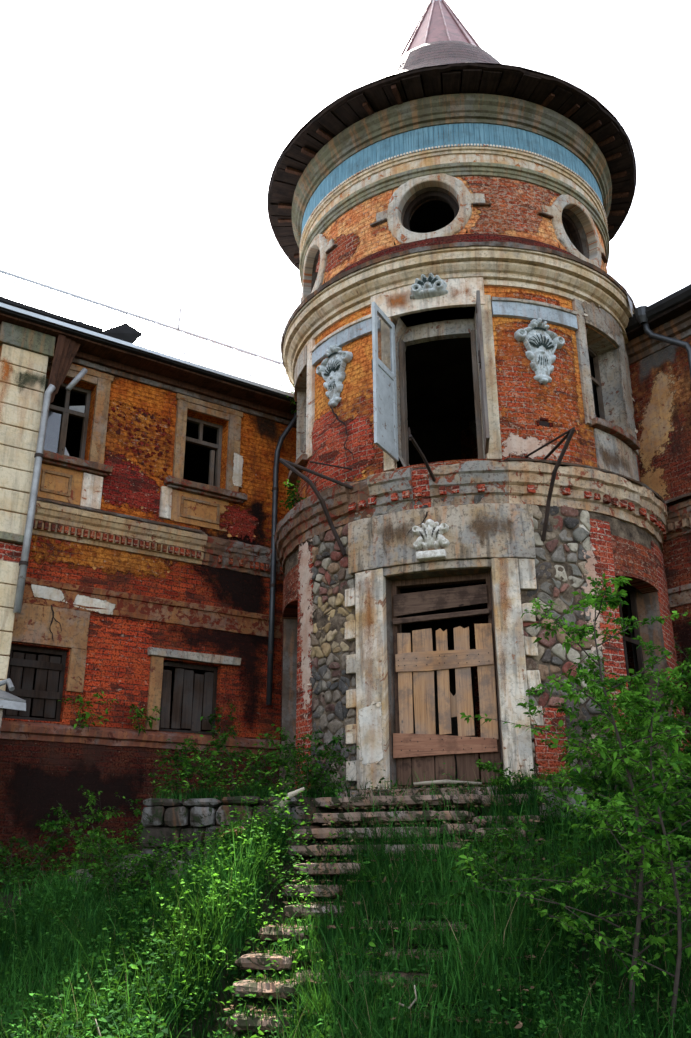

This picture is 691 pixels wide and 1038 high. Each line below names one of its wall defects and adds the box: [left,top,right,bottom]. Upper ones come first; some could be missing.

damp [202,501,266,546]
damp [195,565,267,614]
damp [7,763,144,838]